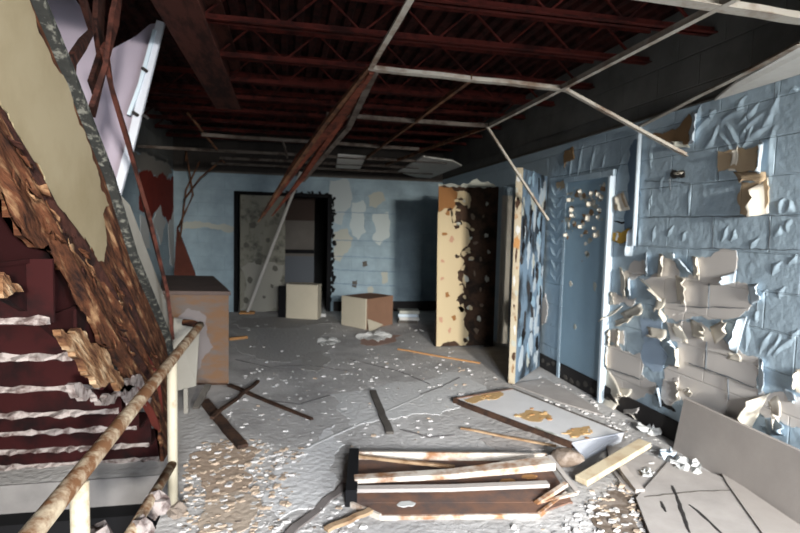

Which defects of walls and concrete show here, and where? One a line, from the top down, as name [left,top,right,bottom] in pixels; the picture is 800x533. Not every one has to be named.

peeling [134,151,174,267]
peeling [556,180,606,257]
peeling [717,144,770,216]
peeling [447,194,491,343]
peeling [511,171,580,387]
peeling [0,315,51,326]
peeling [0,385,68,394]
peeling [0,352,74,362]
peeling [605,249,800,428]